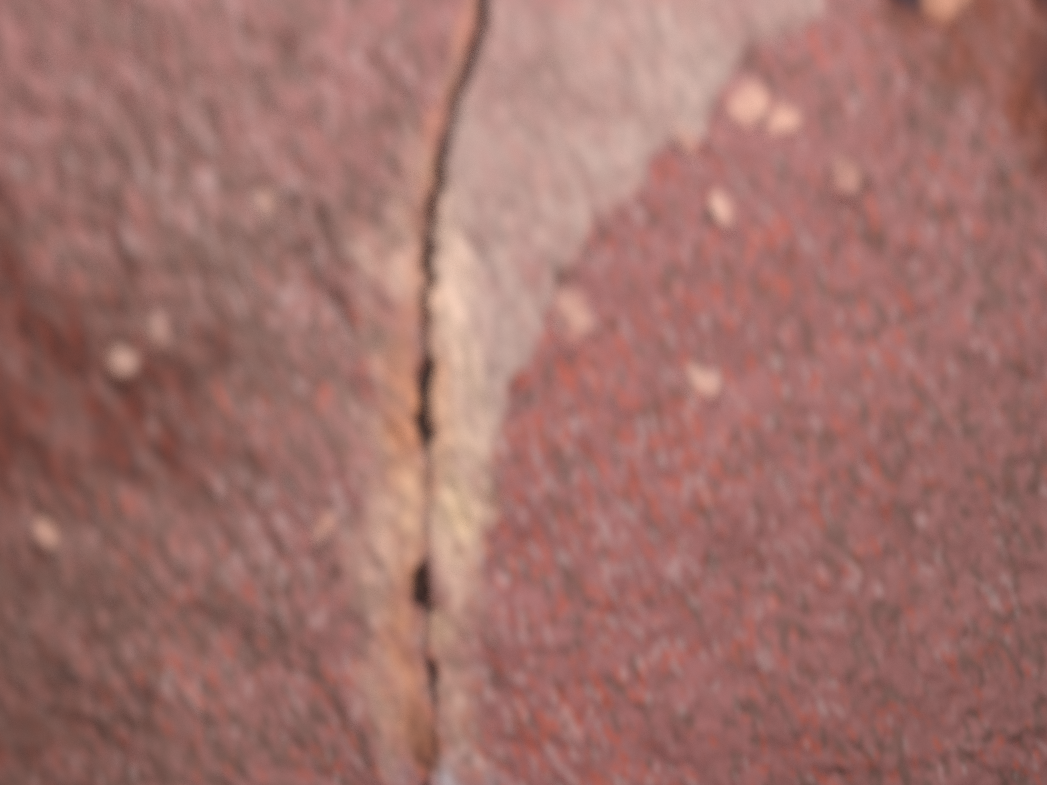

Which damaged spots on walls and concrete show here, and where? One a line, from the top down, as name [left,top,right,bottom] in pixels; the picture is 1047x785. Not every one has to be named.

peeling [719,76,807,141]
peeling [706,187,741,230]
peeling [544,278,599,349]
corrosion [365,0,506,777]
crack [411,0,490,785]
peeling [680,360,727,403]